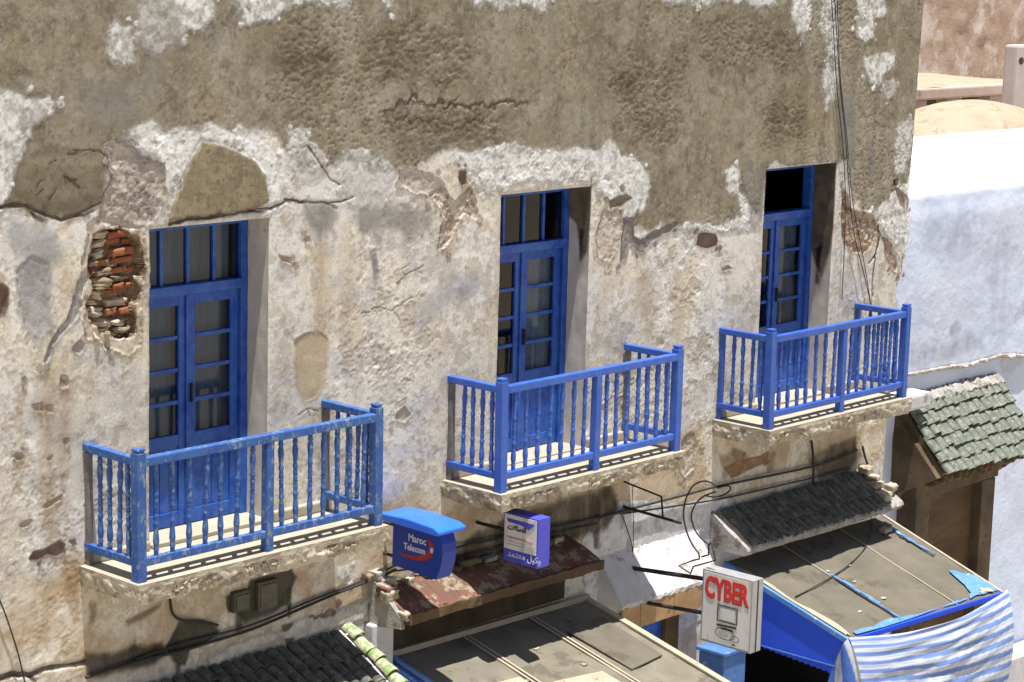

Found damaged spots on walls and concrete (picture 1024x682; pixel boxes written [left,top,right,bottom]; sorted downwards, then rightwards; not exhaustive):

peeling [0,84,65,215]
flaking render [0,121,328,401]
crack [168,145,354,226]
peeling [336,138,761,270]
flaking render [834,115,915,285]